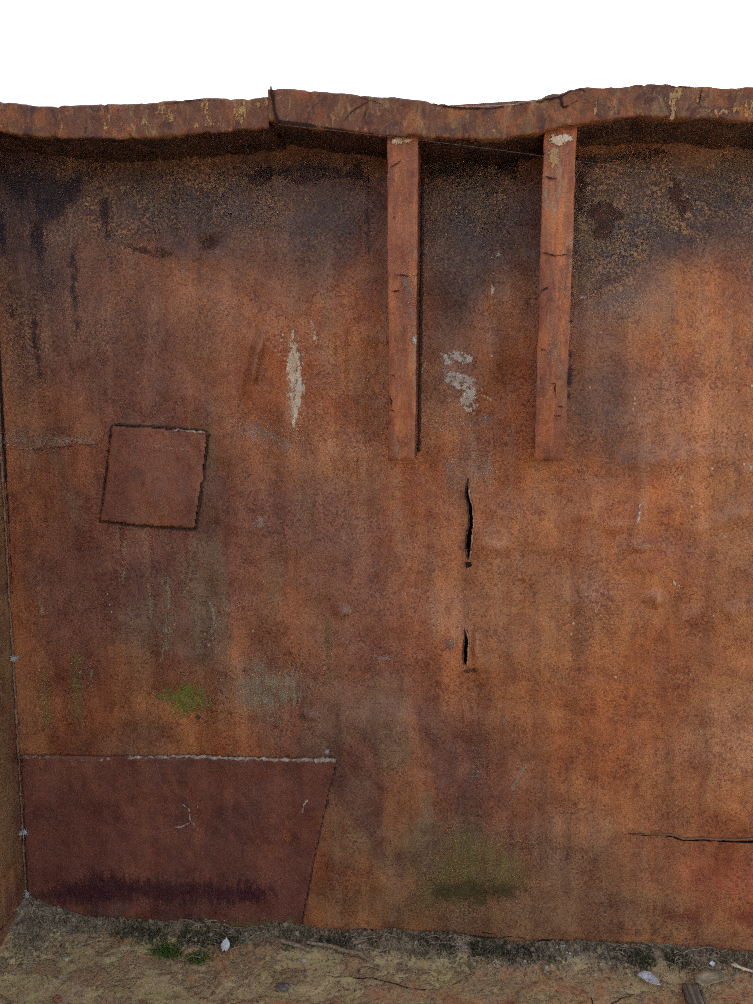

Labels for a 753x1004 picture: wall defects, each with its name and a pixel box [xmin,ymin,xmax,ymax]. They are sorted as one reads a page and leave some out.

peeling [275,330,305,441]
peeling [441,350,492,412]
crack [464,479,474,581]
crack [462,628,476,673]
crack [629,833,753,843]
water stain [49,875,275,906]